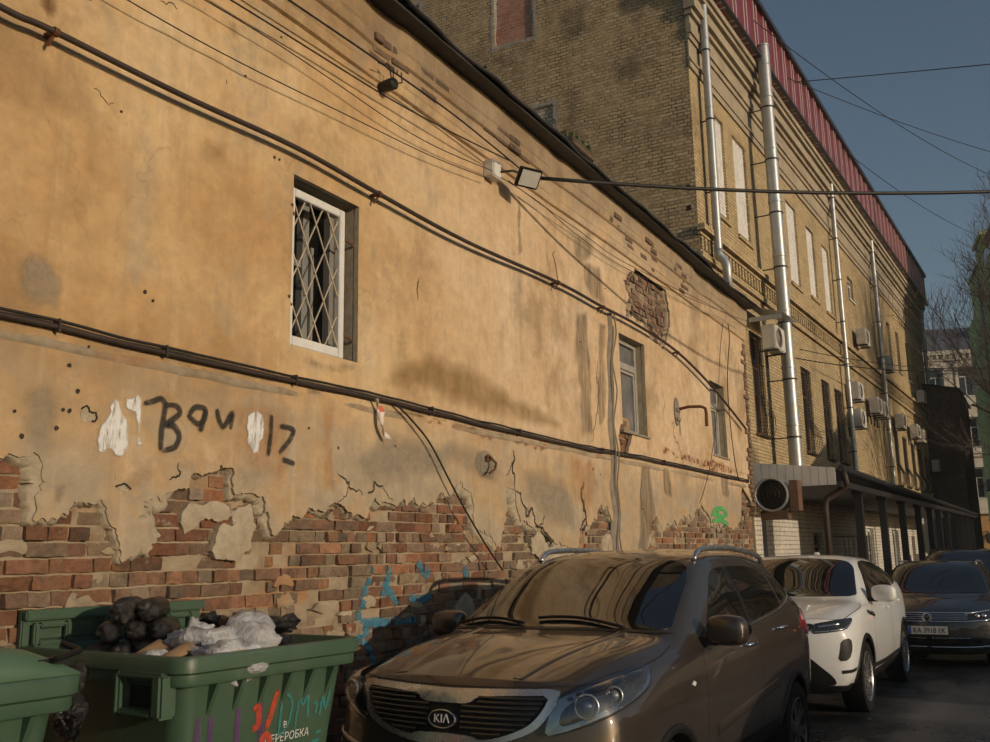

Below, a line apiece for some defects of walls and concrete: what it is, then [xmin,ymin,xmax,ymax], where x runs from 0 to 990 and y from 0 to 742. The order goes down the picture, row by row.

spalling [609,212,668,348]
flaking render [674,262,688,294]
spalling [0,330,299,396]
spalling [345,403,408,420]
spalling [451,417,714,481]
crack [336,474,393,508]
crack [506,450,554,547]
crack [579,482,587,534]
spalling [648,482,756,560]
spalling [0,453,611,742]